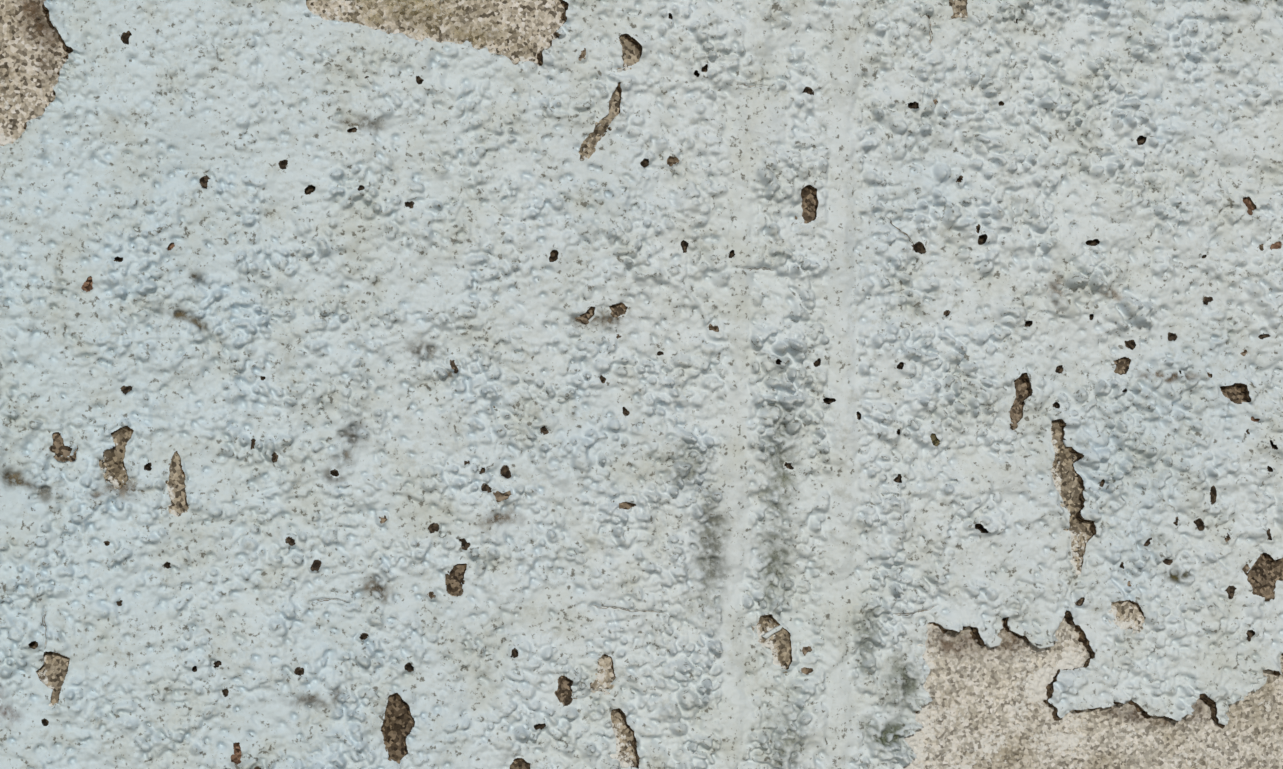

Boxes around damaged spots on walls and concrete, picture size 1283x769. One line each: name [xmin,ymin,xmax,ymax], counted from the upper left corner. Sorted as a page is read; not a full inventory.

peeling [306,0,569,66]
peeling [0,0,73,146]
peeling [578,34,642,161]
peeling [1113,341,1135,392]
peeling [99,426,134,489]
peeling [1050,402,1105,575]
peeling [1242,537,1283,601]
peeling [751,614,803,673]
peeling [903,598,1283,769]
peeling [381,693,415,764]
peeling [510,758,531,769]